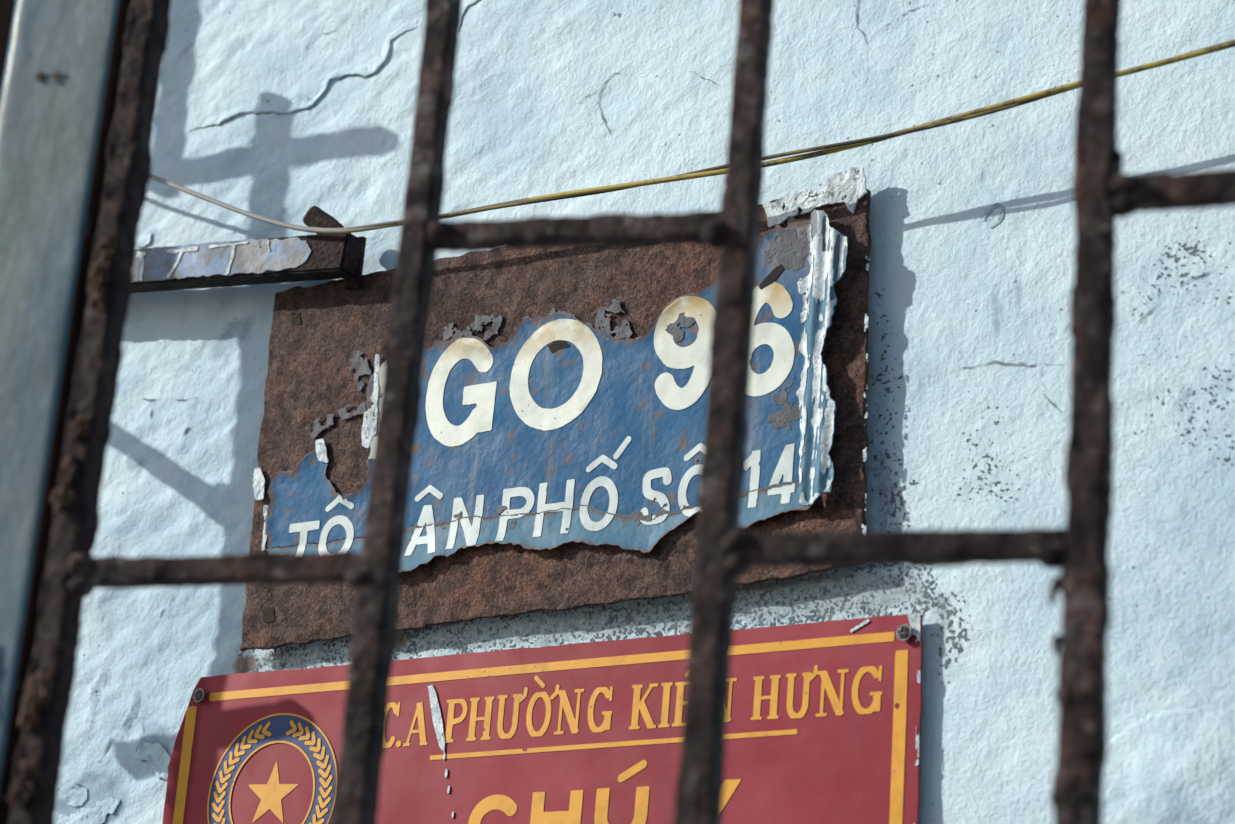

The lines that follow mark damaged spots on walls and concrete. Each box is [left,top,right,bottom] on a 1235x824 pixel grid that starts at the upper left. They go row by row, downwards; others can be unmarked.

crack [460,0,480,26]
crack [189,18,417,131]
crack [578,65,629,132]
peeling [139,725,171,773]
peeling [55,775,120,824]